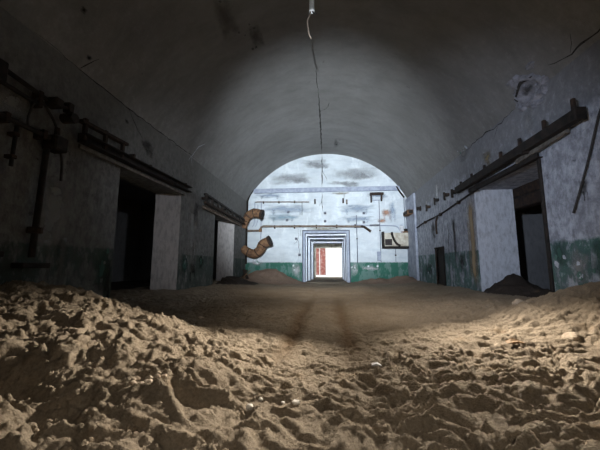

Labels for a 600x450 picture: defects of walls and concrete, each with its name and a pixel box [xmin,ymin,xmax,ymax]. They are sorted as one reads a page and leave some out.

crack [549,29,600,65]
spalling [505,61,550,115]
crack [316,68,329,211]